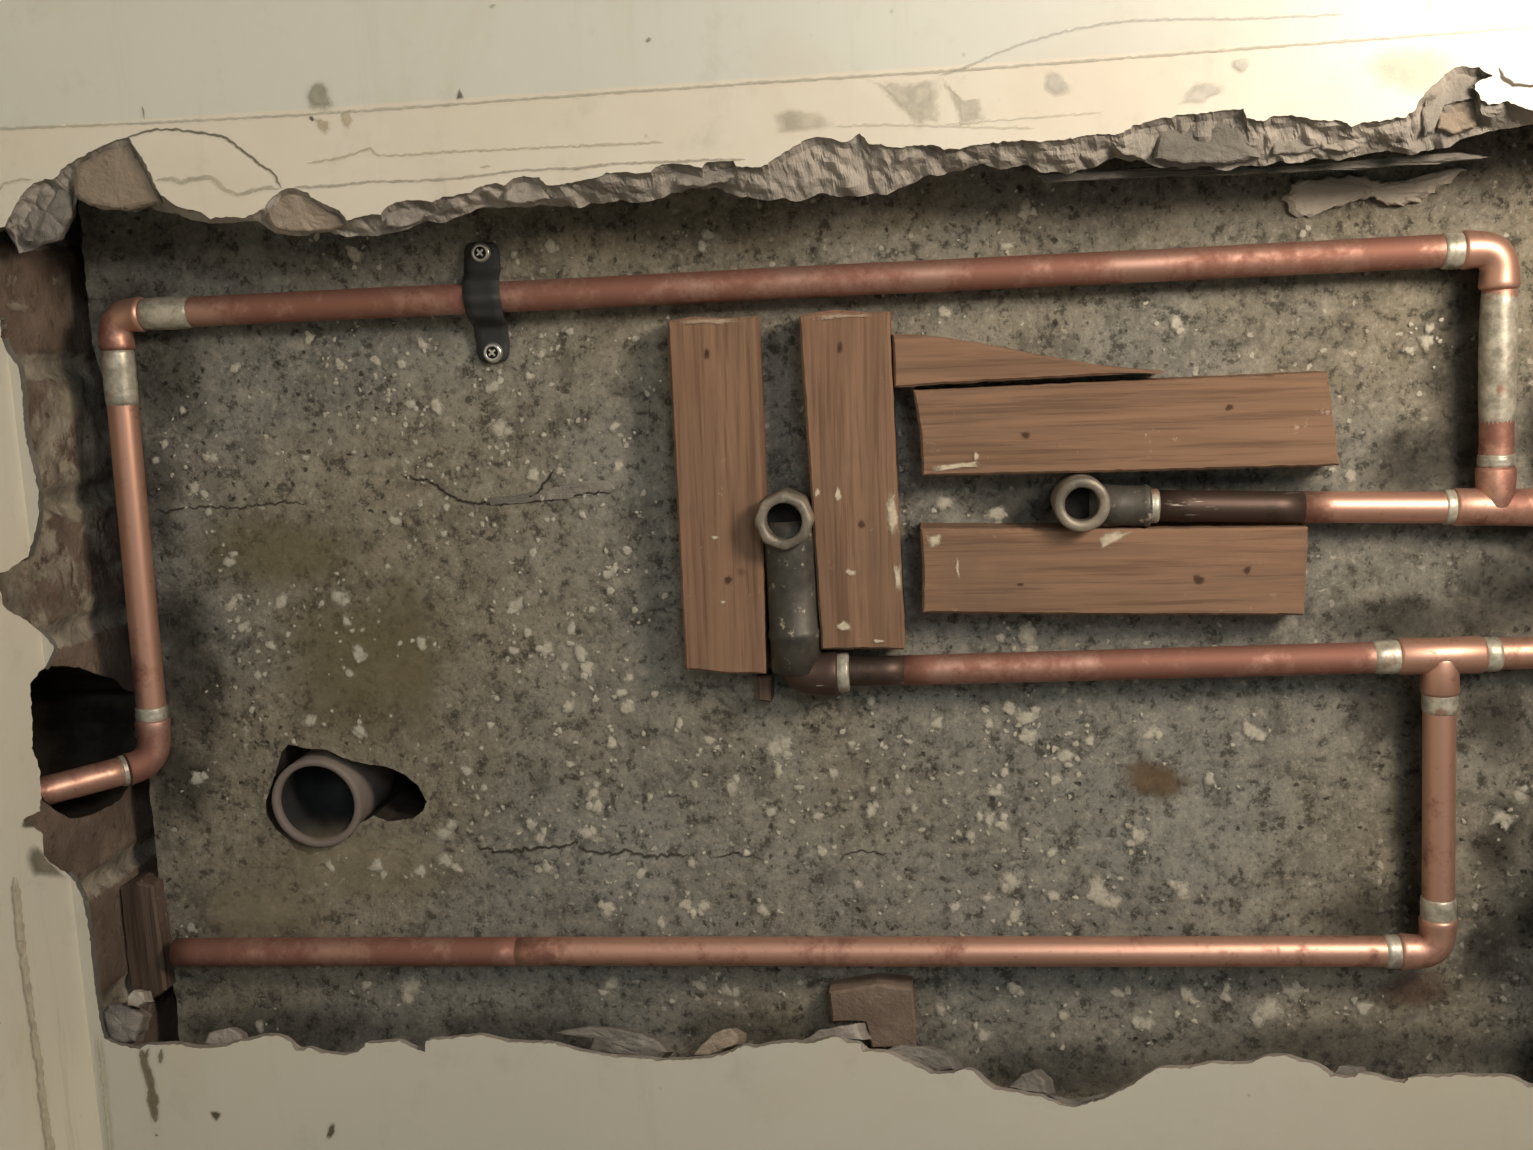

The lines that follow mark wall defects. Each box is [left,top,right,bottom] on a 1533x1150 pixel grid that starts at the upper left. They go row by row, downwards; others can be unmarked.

crack [0,178,30,189]
crack [127,128,282,195]
spalling [0,66,1533,253]
spalling [0,318,44,557]
crack [401,469,613,506]
spalling [38,627,58,670]
spalling [31,850,1533,1107]